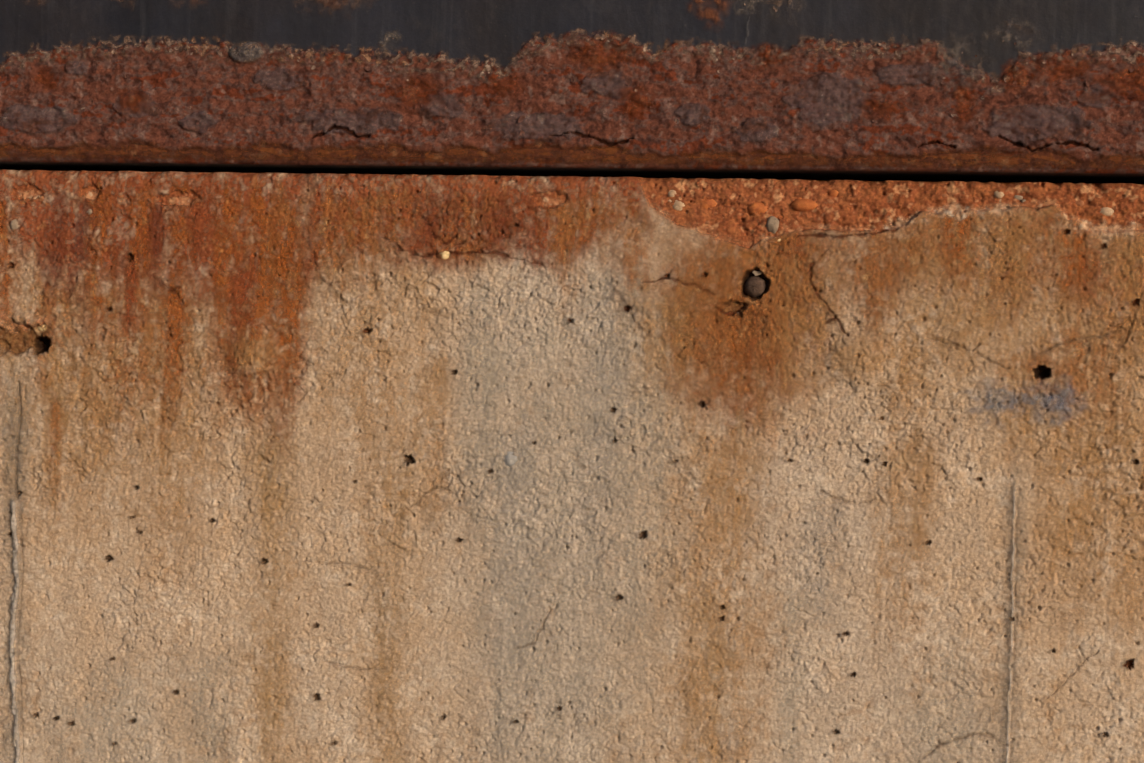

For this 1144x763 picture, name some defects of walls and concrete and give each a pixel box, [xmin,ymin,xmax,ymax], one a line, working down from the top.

rust [0,170,647,401]
crack [795,229,898,336]
rust [845,205,1144,324]